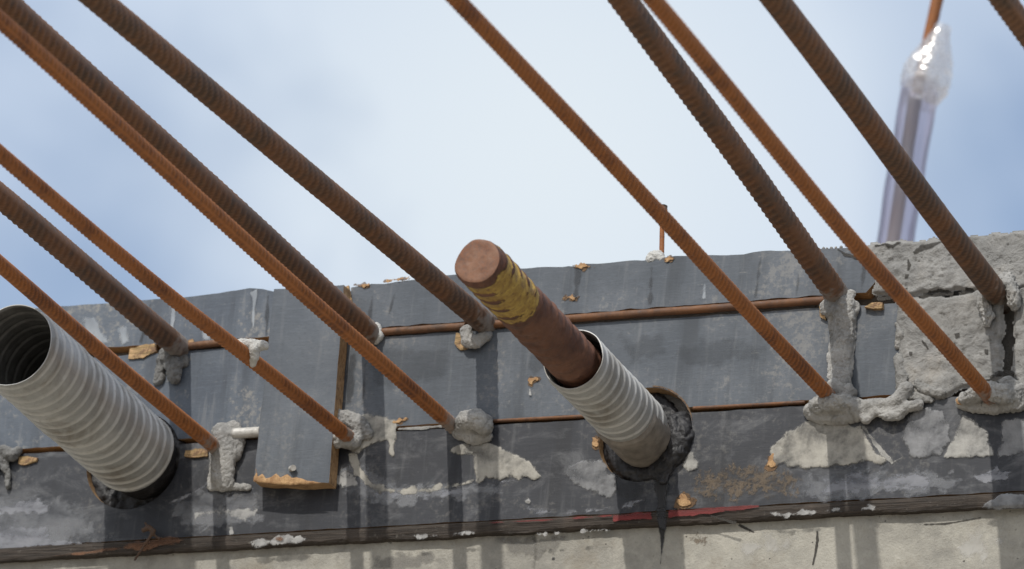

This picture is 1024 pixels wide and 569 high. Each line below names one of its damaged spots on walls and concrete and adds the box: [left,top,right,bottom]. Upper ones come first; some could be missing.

spalling [919,287,974,298]
spalling [990,370,1015,378]
crack [811,531,819,565]